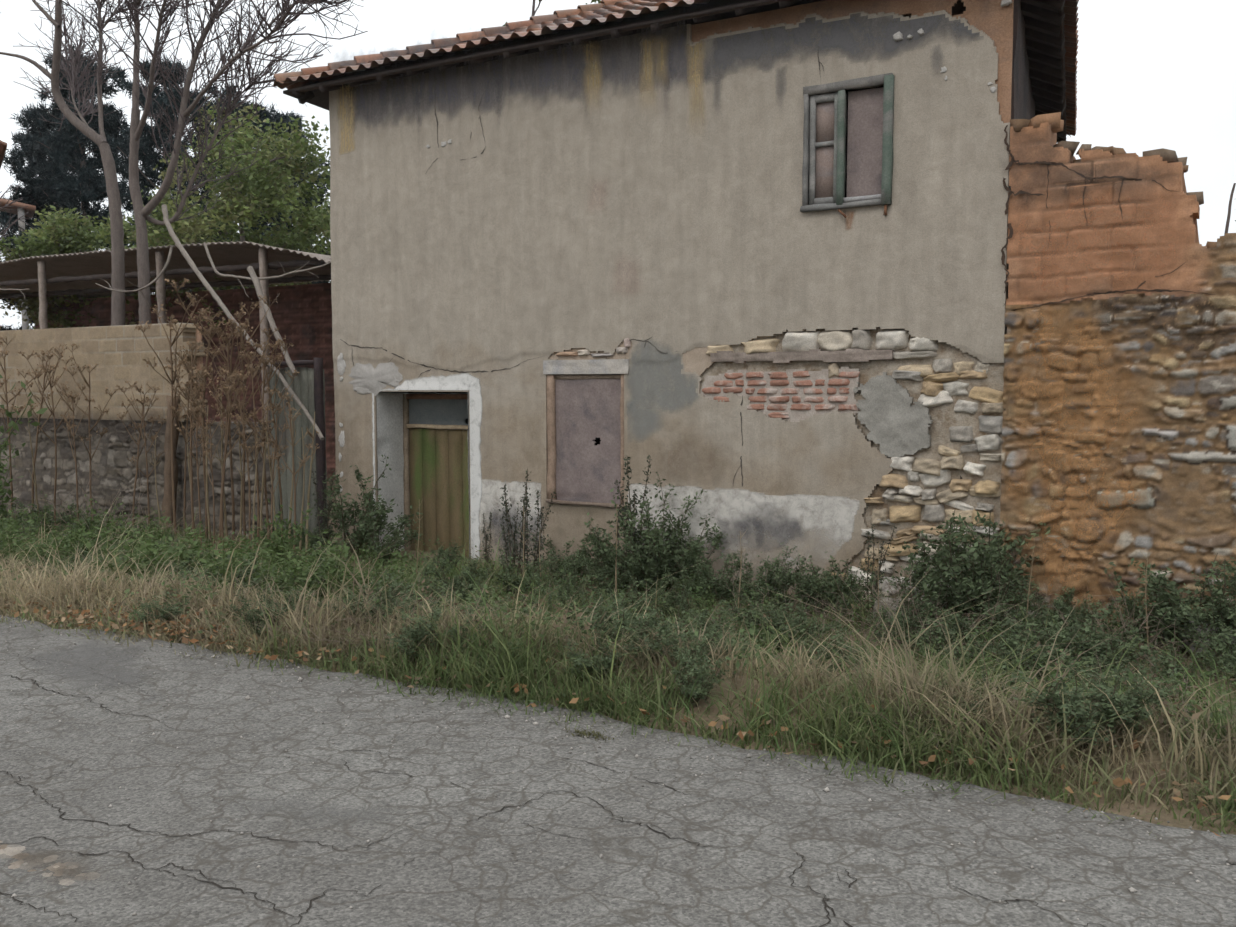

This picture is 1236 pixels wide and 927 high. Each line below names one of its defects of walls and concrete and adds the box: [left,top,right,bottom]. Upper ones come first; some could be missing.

damp [341,6,980,122]
spalling [692,0,1014,123]
crack [1001,125,1215,311]
crack [340,339,539,375]
spalling [683,327,1005,607]